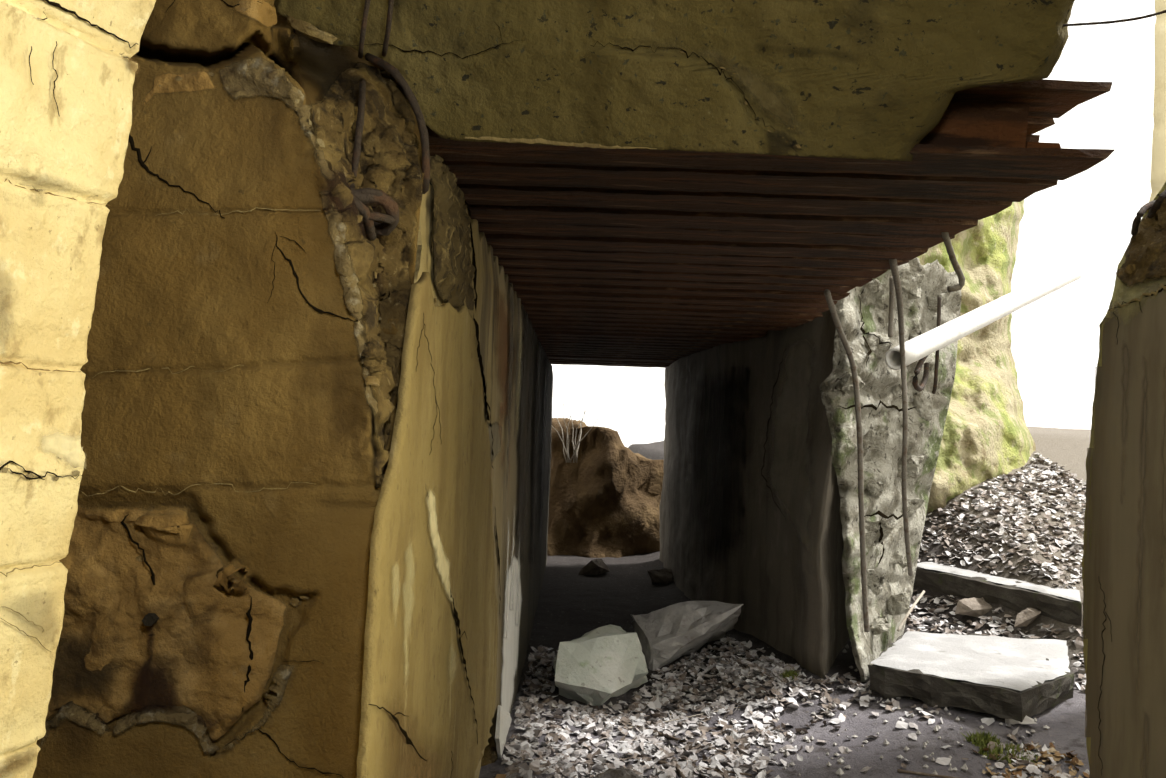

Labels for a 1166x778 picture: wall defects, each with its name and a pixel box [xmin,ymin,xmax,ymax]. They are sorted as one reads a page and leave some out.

crack [29,0,137,117]
crack [349,25,518,59]
crack [128,134,353,321]
corrosion [326,171,384,233]
spalling [1108,198,1166,311]
crack [1107,285,1166,343]
peeling [143,57,512,778]
spalling [39,505,310,754]
crack [368,589,478,778]